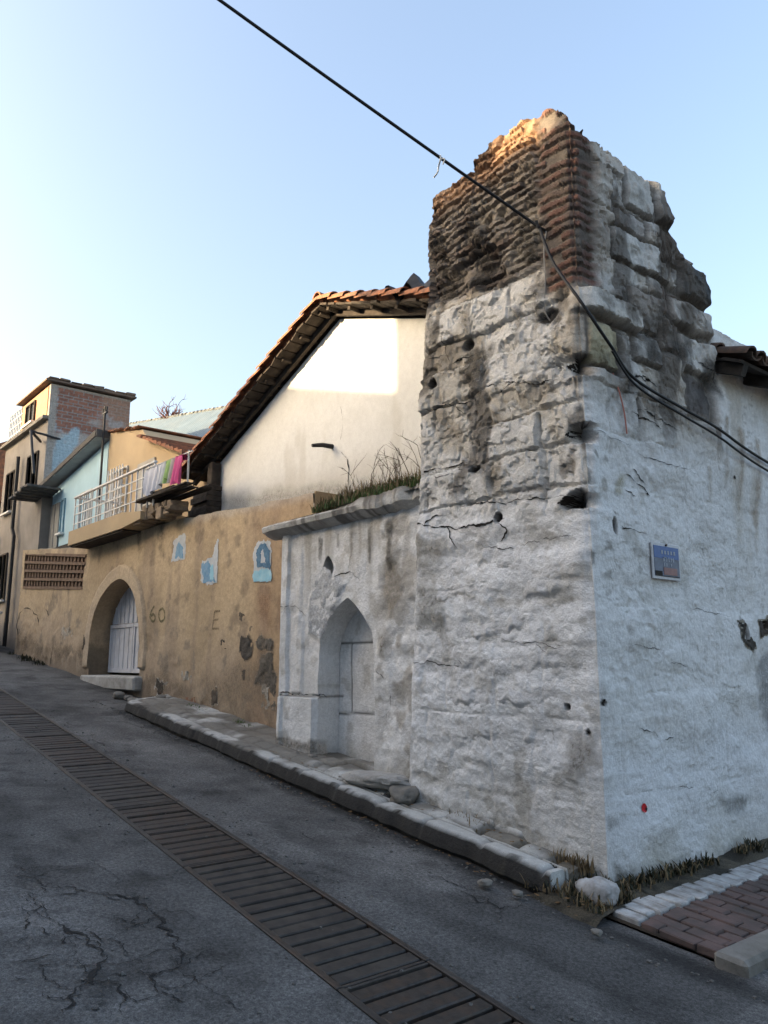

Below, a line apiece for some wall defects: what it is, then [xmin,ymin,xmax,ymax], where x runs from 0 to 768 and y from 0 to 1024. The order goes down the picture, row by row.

crack [417,495,571,550]
spalling [737,615,768,654]
spalling [239,612,278,714]